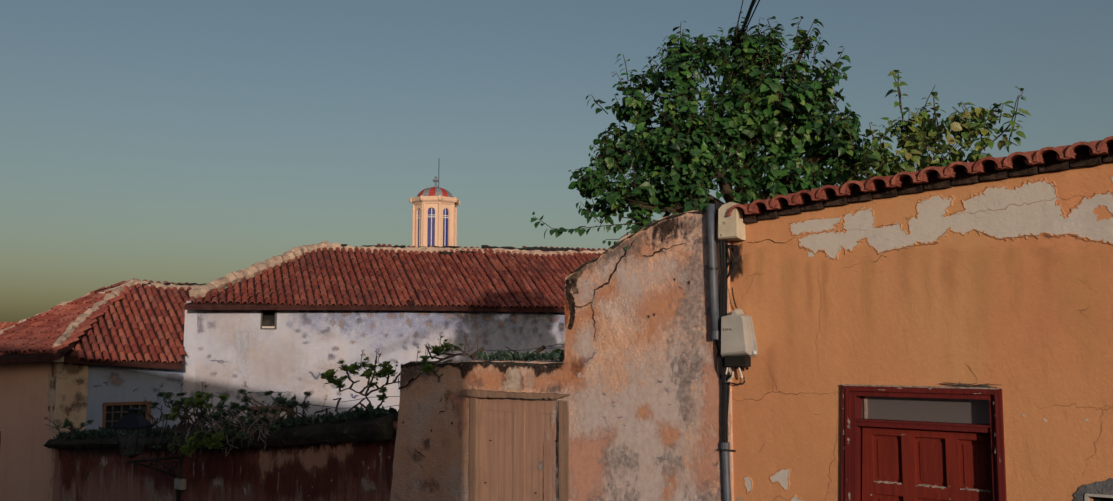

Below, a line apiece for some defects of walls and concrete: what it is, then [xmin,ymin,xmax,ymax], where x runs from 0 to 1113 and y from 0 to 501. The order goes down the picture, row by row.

peeling [789,177,1113,261]
crack [582,240,684,364]
leakage [567,218,723,501]
leakage [59,430,397,501]
peeling [769,467,803,501]